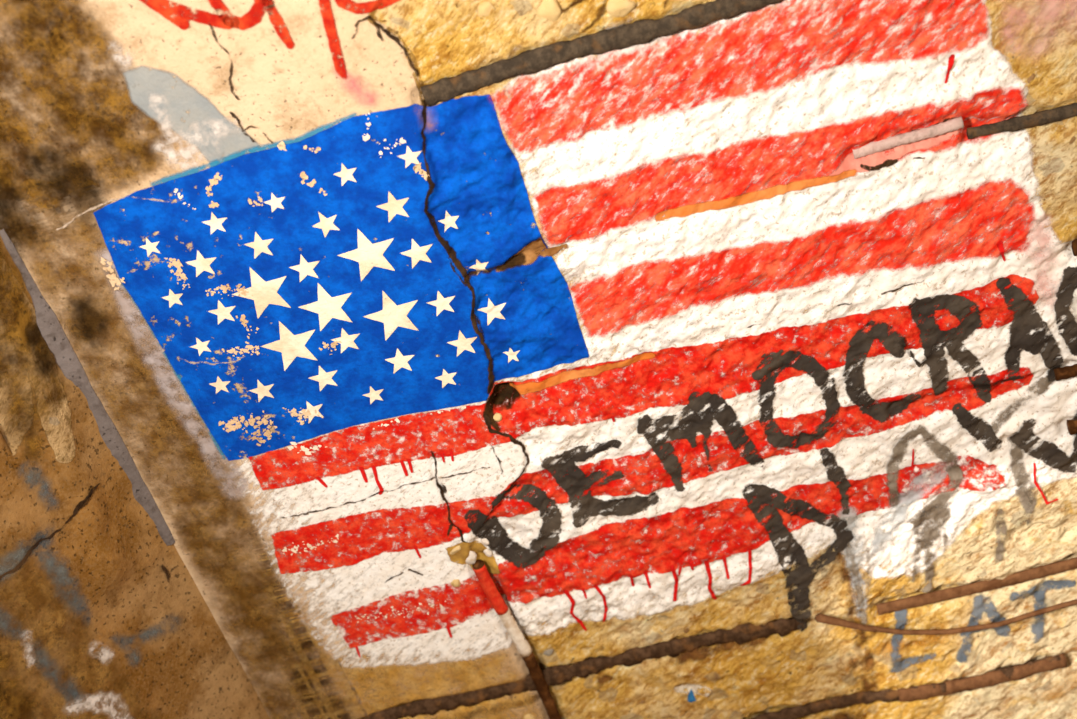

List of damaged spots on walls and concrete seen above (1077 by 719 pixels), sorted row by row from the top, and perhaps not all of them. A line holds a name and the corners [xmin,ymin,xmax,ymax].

crack [209,24,273,143]
spalling [984,0,1077,248]
spalling [362,0,748,431]
crack [281,15,529,543]
crack [0,483,100,580]
peeling [355,600,446,623]
spalling [446,538,500,574]
rust [465,695,539,718]
rust [677,638,766,664]
spalling [515,473,1077,719]
rust [837,552,937,692]